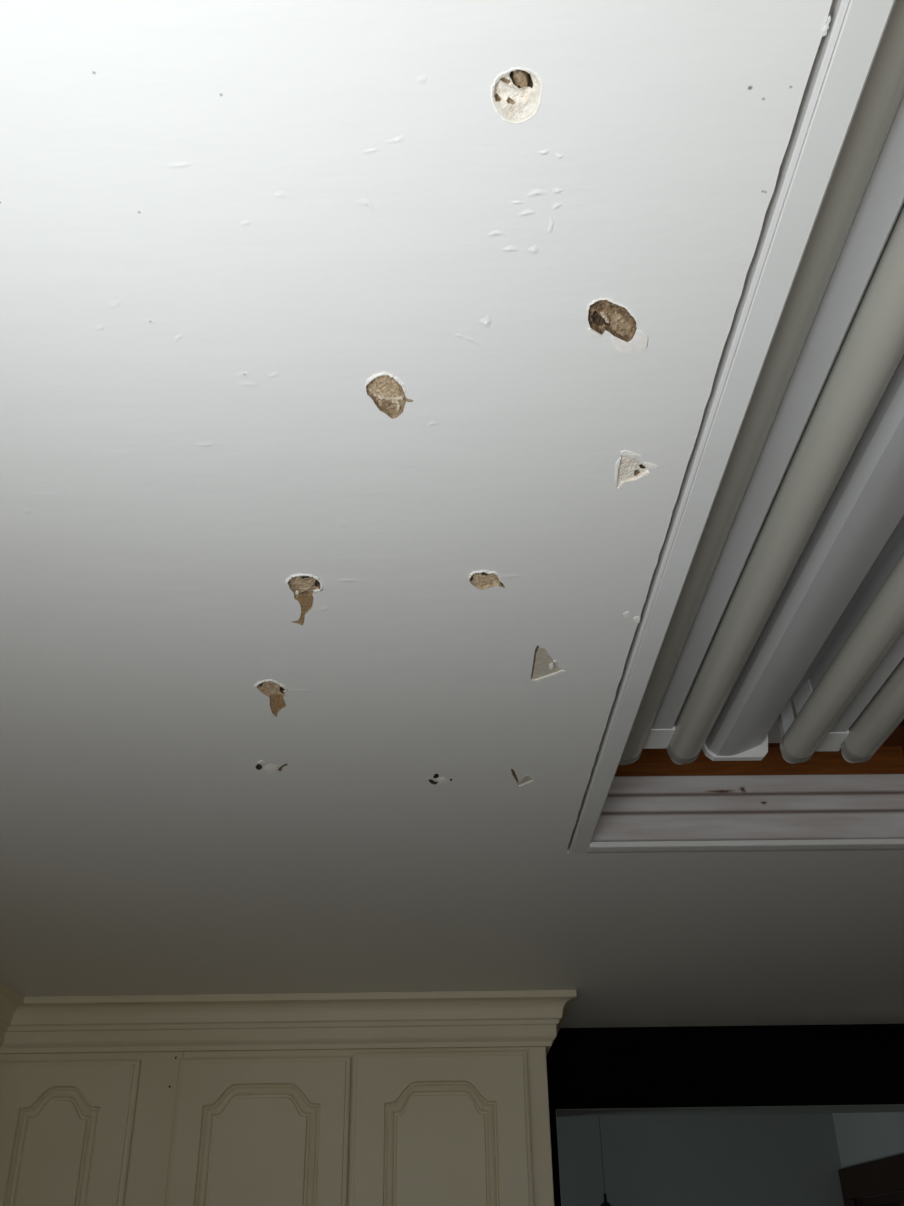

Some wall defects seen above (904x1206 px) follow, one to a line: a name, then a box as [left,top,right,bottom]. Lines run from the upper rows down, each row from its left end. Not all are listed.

spalling [490,67,543,124]
spalling [587,298,649,353]
spalling [365,371,413,419]
spalling [615,450,658,489]
spalling [285,573,360,626]
spalling [468,570,524,590]
spalling [531,645,566,682]
spalling [254,679,317,717]
spalling [256,760,287,774]
spalling [429,774,452,784]